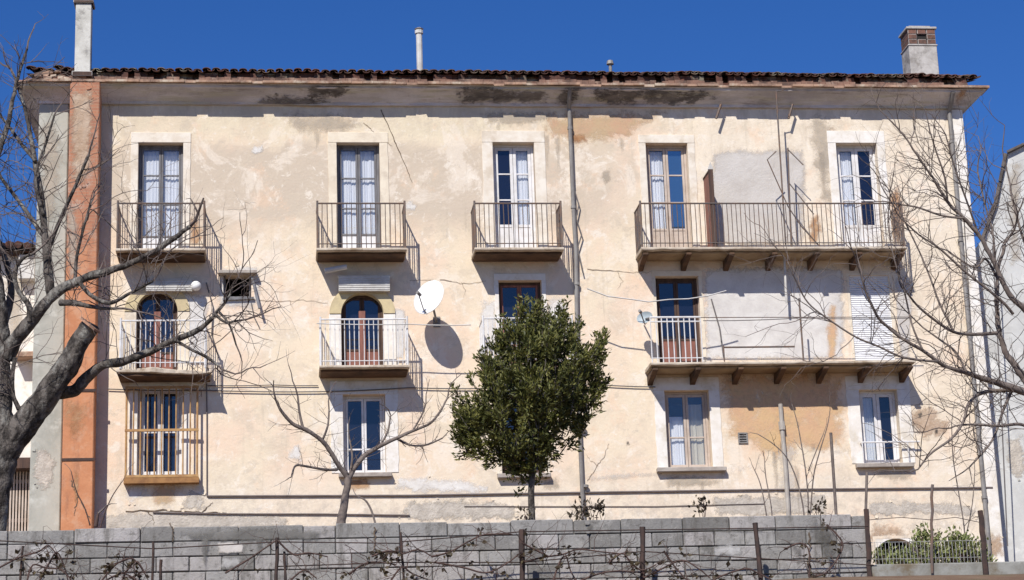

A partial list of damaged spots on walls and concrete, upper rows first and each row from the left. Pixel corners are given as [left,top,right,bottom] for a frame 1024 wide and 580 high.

water stain [259,86,353,131]
water stain [456,87,716,142]
crack [364,110,412,181]